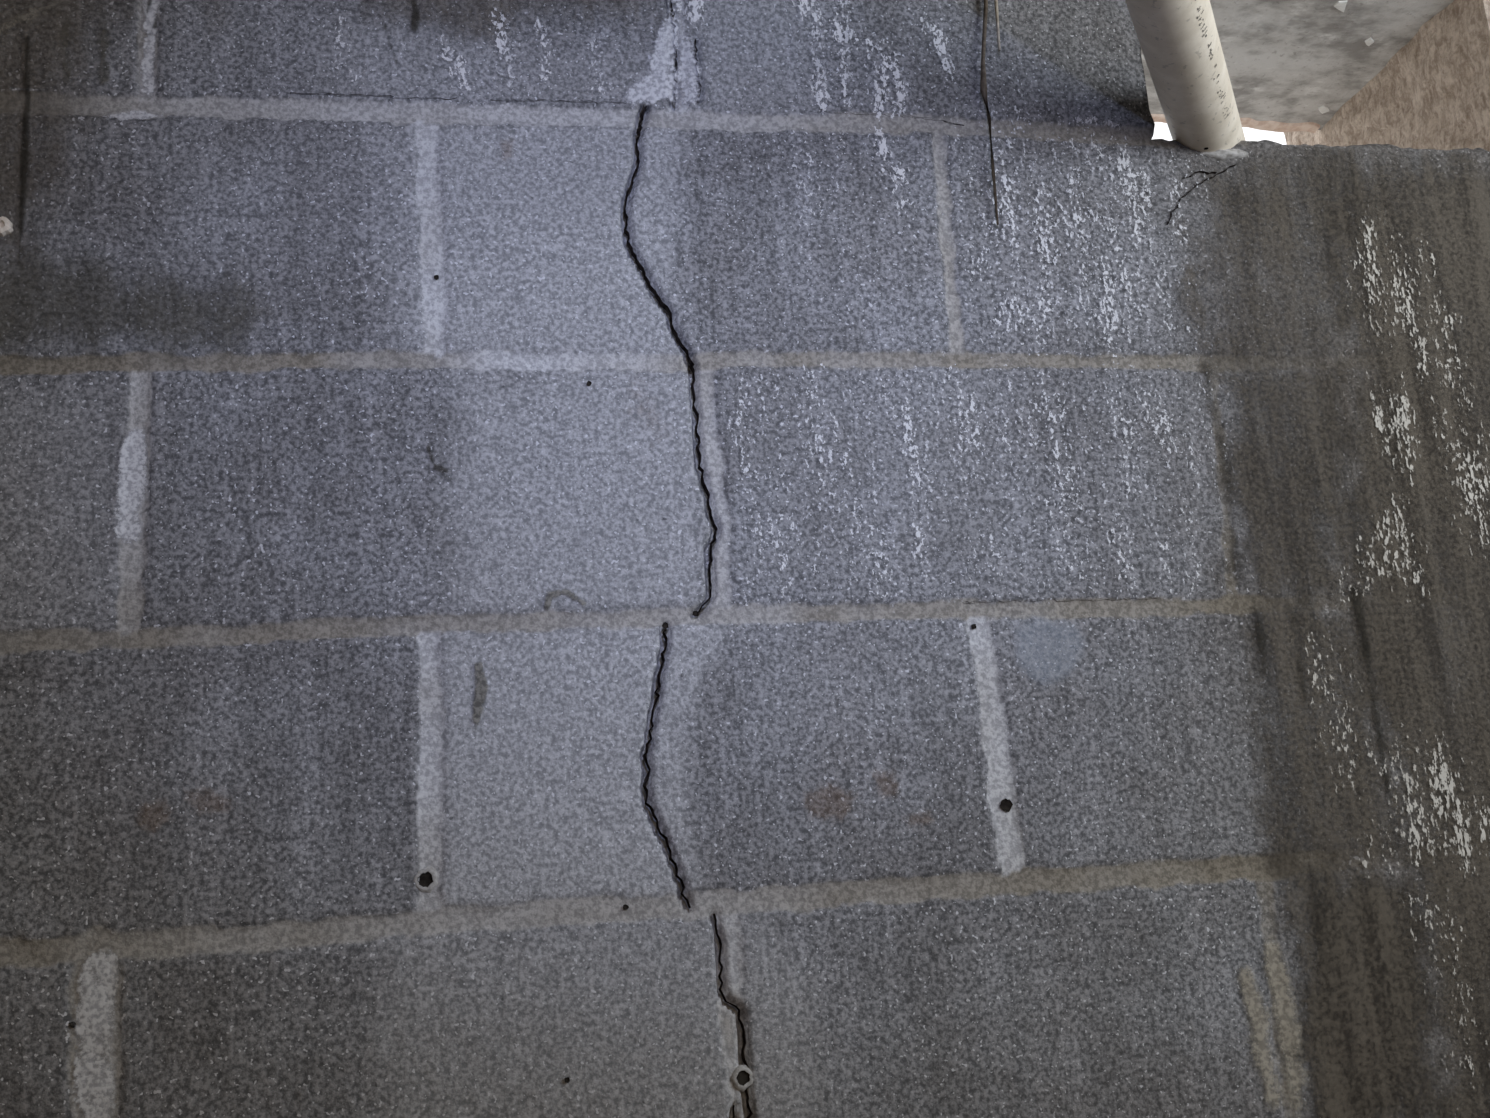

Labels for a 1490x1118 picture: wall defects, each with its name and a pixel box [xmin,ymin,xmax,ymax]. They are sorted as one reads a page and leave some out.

crack [290,0,718,614]
leakage [799,0,915,232]
leakage [920,12,955,81]
leakage [727,89,1490,1118]
crack [642,628,753,1118]